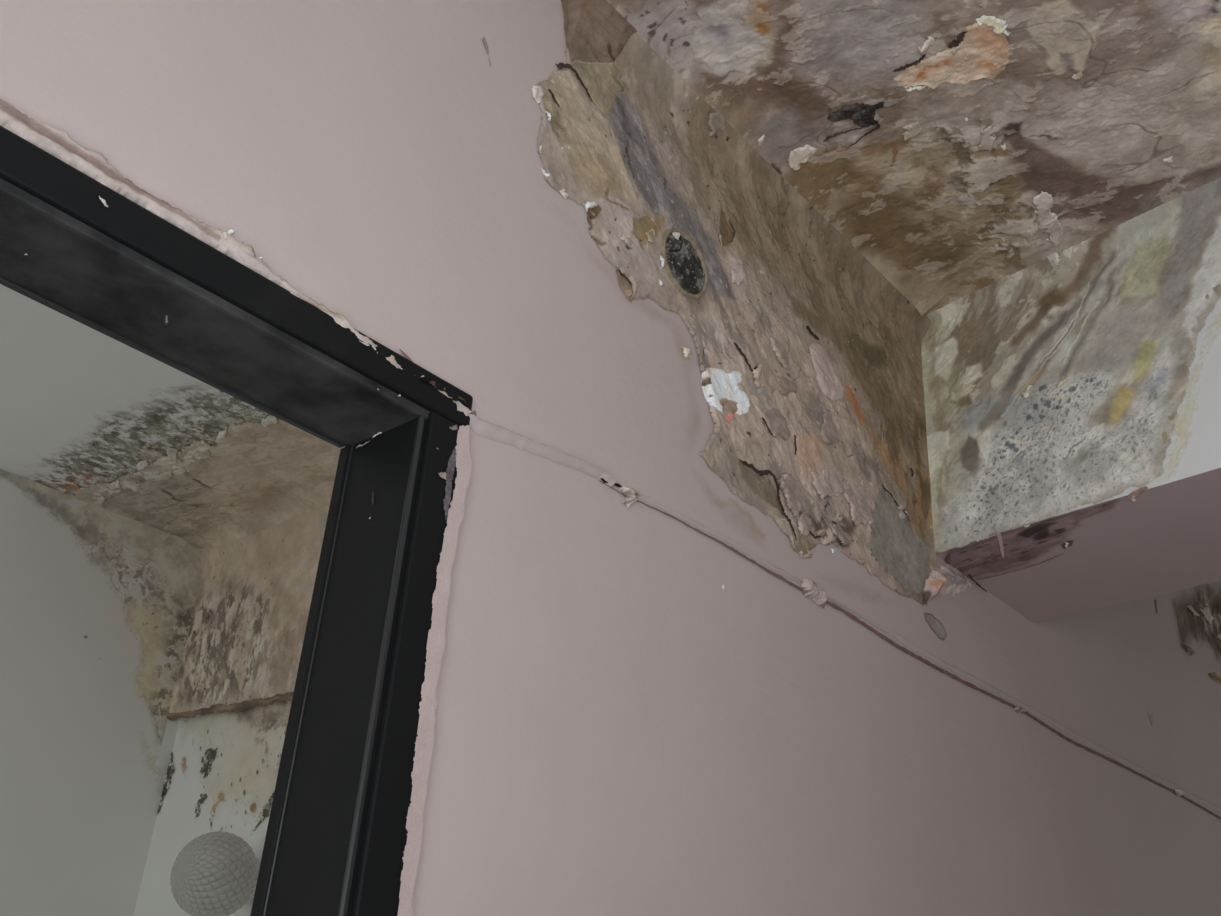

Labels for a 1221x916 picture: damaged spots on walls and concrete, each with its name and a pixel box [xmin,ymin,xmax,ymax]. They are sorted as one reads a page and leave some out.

water stain [0,390,330,832]
flaking render [71,415,345,554]
flaking render [166,692,293,722]
crack [468,414,1221,819]
flaking render [532,0,1221,640]
water stain [921,177,1221,580]